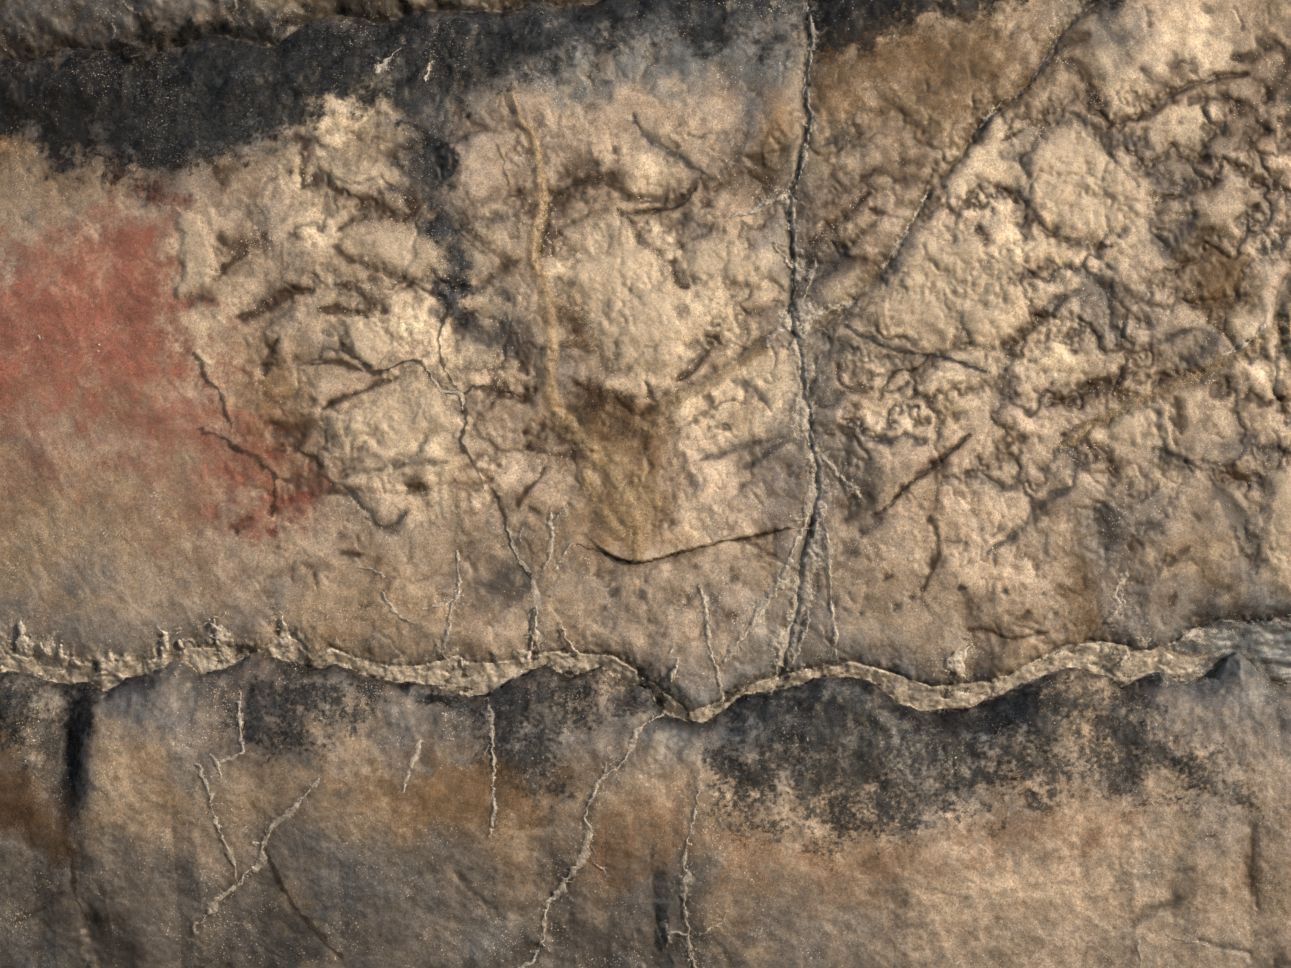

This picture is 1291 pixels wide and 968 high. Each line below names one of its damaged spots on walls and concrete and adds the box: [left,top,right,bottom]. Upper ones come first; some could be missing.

crack [969,0,1115,145]
crack [536,177,592,252]
crack [576,2,984,692]
crack [1176,615,1291,643]
crack [264,846,343,959]